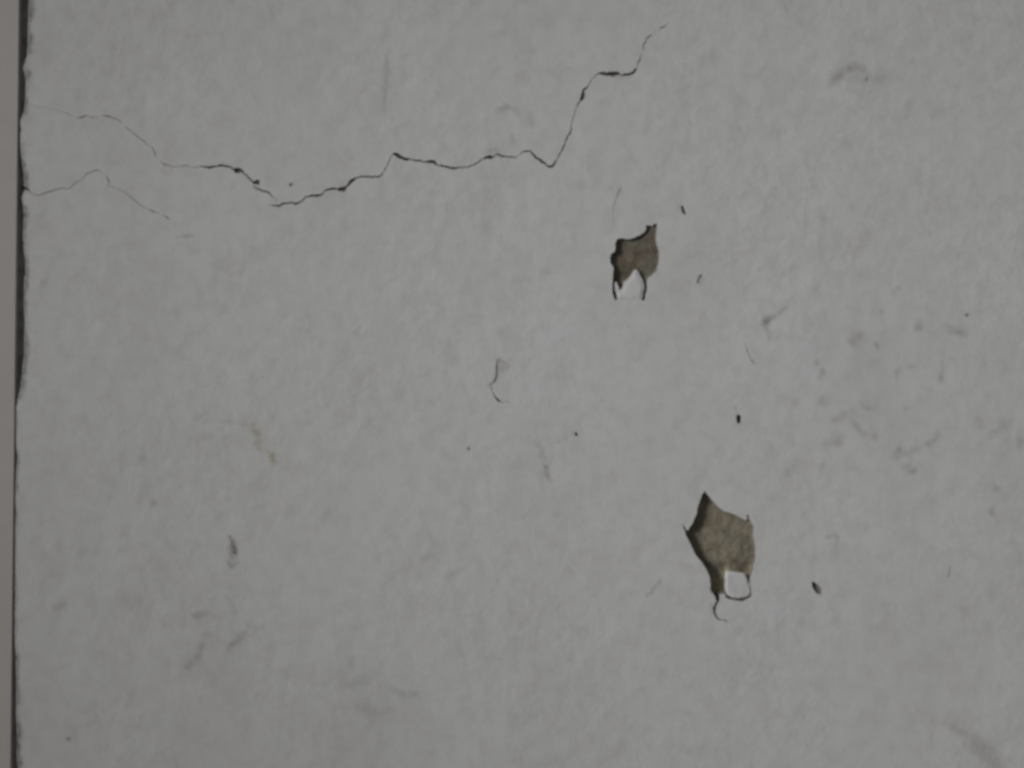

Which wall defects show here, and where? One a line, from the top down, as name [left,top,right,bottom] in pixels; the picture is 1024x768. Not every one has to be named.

crack [16,0,669,406]
spalling [610,223,659,300]
crack [12,449,20,768]
spalling [682,491,755,622]